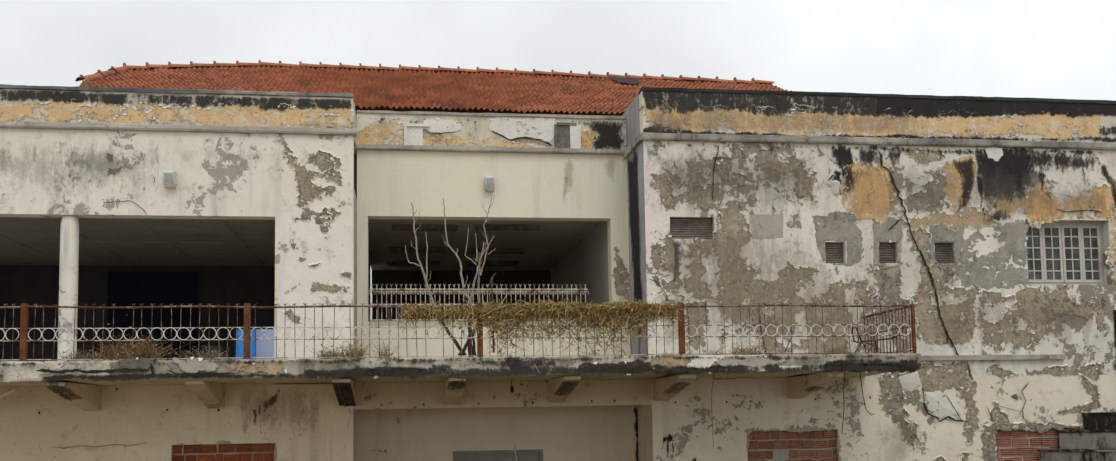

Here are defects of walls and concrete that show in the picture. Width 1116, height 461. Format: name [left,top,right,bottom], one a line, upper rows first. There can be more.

peeling [0,99,404,240]
flaking render [290,237,353,294]
peeling [422,116,556,152]
leakage [572,121,806,328]
flaking render [554,98,1107,461]
leakage [642,90,1116,221]
crack [878,150,974,381]
peeling [1090,182,1116,284]
crack [923,381,1030,422]